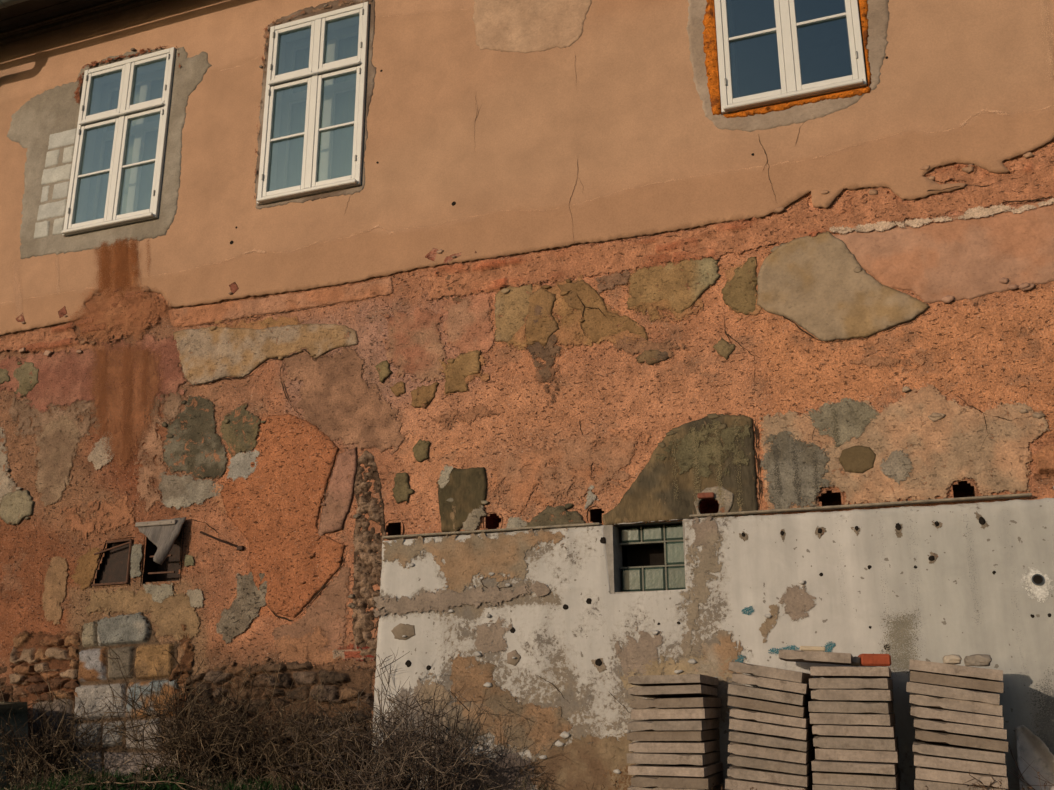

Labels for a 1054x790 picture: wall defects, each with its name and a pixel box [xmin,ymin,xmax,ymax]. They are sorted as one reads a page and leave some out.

spalling [0,144,1054,661]
flaking render [33,547,203,779]
peeling [373,428,650,790]
peeling [615,516,743,690]